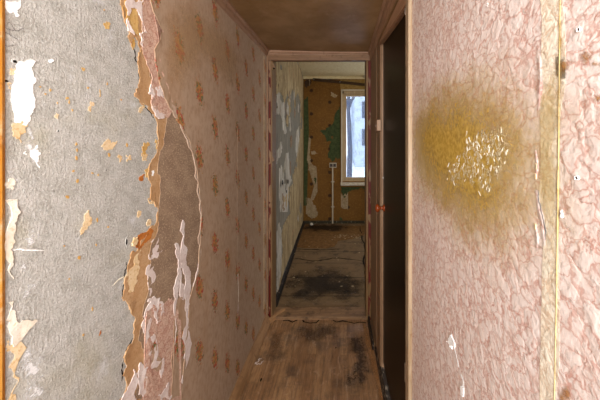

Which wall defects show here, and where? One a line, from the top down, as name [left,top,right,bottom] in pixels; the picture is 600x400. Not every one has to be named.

peeling [11,121,28,142]
peeling [269,61,318,292]
peeling [320,107,340,162]
leakage [416,103,517,213]